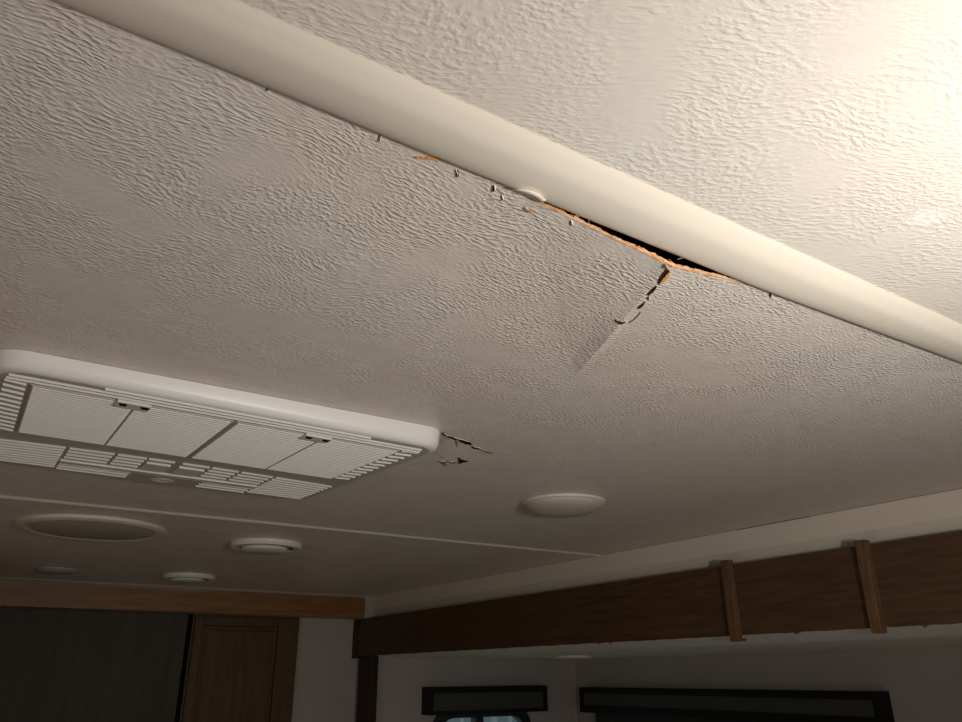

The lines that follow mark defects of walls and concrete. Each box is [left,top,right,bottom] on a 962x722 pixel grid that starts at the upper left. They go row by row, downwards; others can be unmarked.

crack [615,269,671,325]
crack [439,432,493,466]